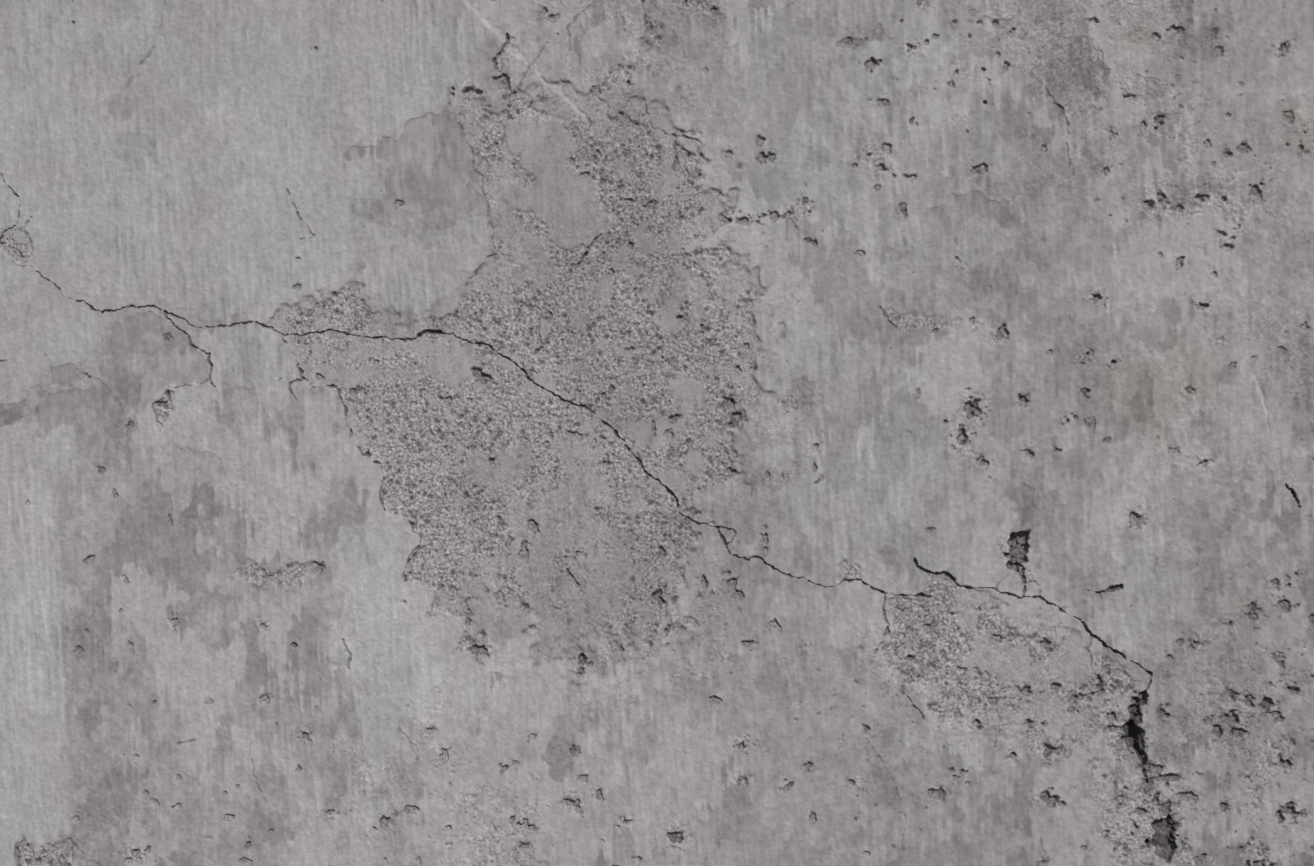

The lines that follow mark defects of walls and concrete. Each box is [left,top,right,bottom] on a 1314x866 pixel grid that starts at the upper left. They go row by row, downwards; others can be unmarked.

spalling [542,7,561,25]
crack [508,0,598,100]
flaking render [633,0,670,54]
crack [645,104,703,173]
crack [1044,85,1072,169]
crack [457,122,515,287]
flaking render [262,32,819,711]
crack [0,173,1155,812]
spalling [812,433,826,486]
spalling [1020,449,1036,461]
flaking render [878,483,1314,866]
crack [865,739,908,856]